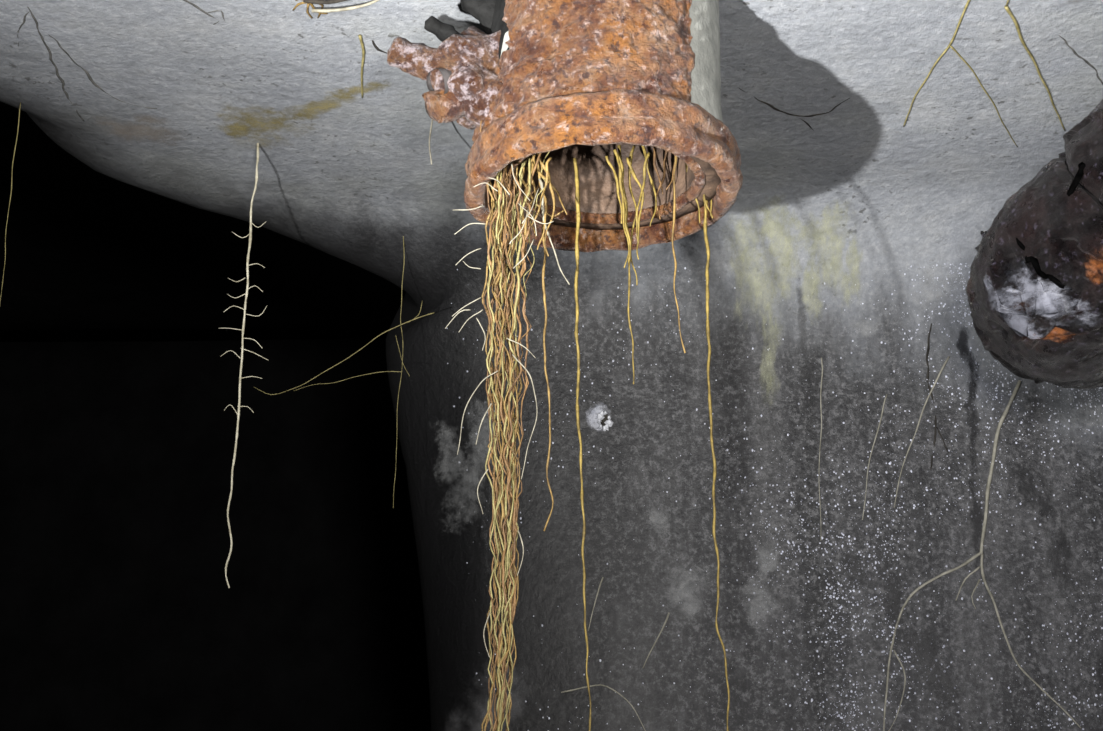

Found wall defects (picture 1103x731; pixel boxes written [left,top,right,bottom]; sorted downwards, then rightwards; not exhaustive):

crack [17,7,157,121]
water stain [956,330,985,568]